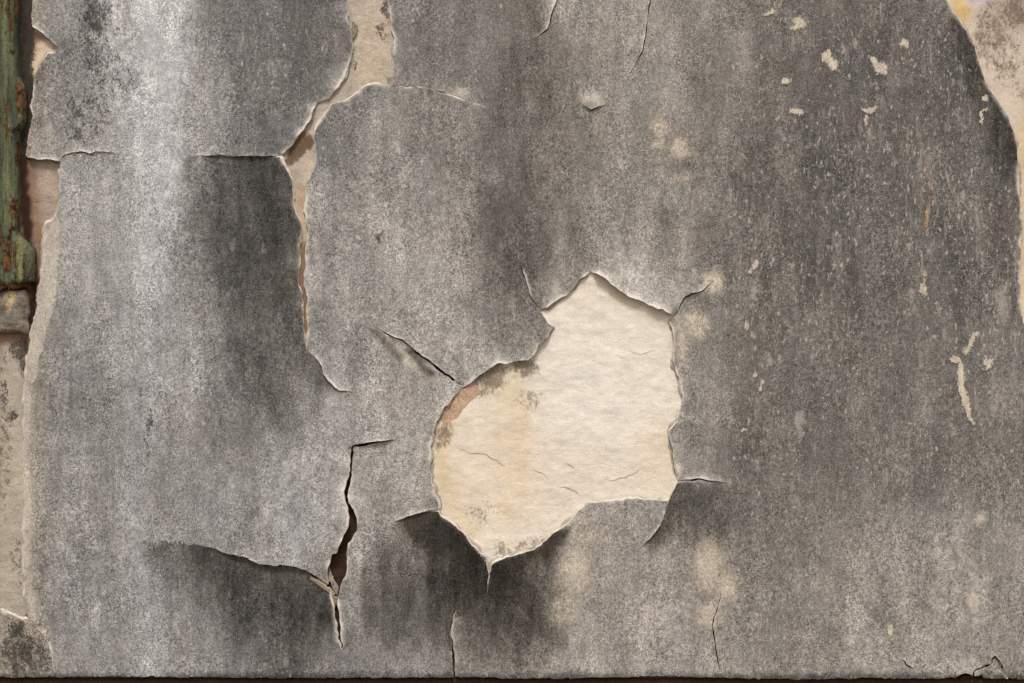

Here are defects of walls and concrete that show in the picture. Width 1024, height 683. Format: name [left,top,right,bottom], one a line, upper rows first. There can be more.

spalling [789,16,809,32]
spalling [821,49,838,71]
spalling [868,55,888,77]
peeling [272,0,404,355]
spalling [861,105,877,126]
peeling [942,0,1024,323]
crack [369,321,462,388]
water stain [477,361,539,395]
peeling [415,260,697,573]
spalling [950,331,997,425]
crack [206,431,437,649]
water stain [403,511,602,637]